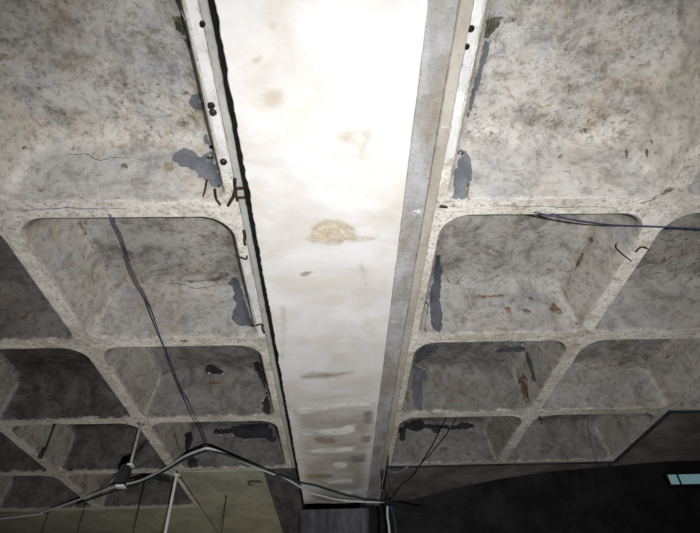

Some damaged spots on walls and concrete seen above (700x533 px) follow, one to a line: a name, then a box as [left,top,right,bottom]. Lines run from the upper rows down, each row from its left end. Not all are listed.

peeling [188,93,203,111]
peeling [172,134,224,194]
peeling [450,150,472,199]
leakage [309,221,369,244]
peeling [228,276,252,327]
peeling [427,238,444,332]
peeling [399,345,474,441]
corrosion [518,374,529,404]
peeling [184,431,198,468]
peeling [214,424,277,442]